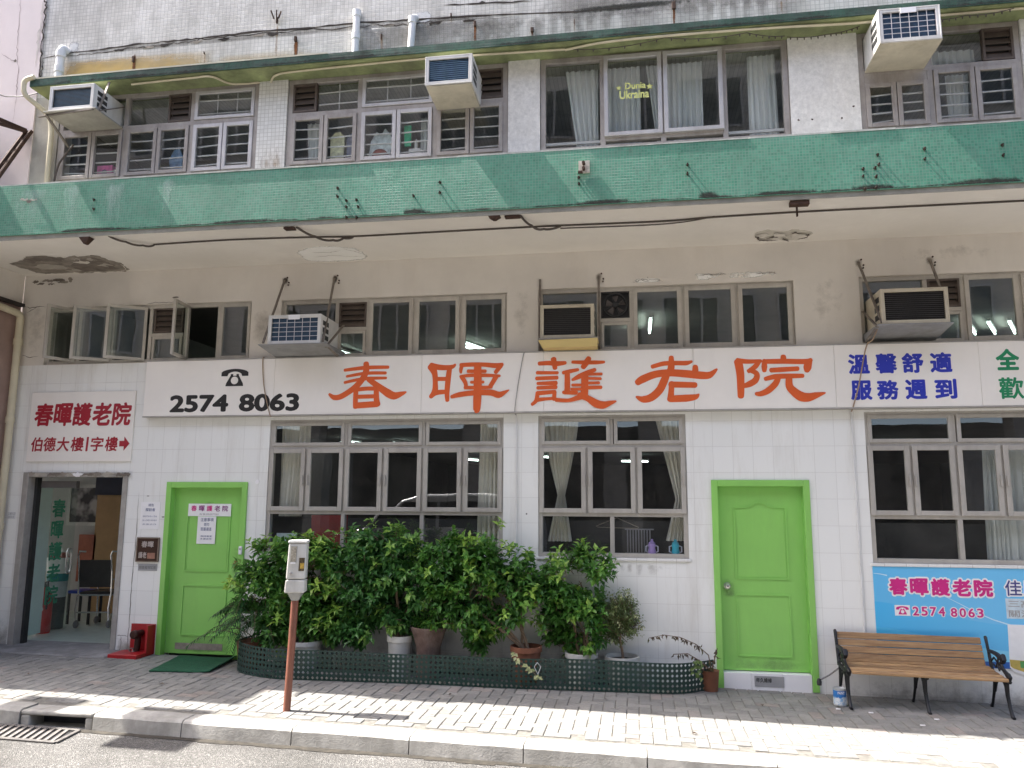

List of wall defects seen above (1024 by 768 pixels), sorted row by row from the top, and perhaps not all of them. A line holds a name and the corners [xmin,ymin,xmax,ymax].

peeling [755,229,813,241]
spalling [10,255,130,285]